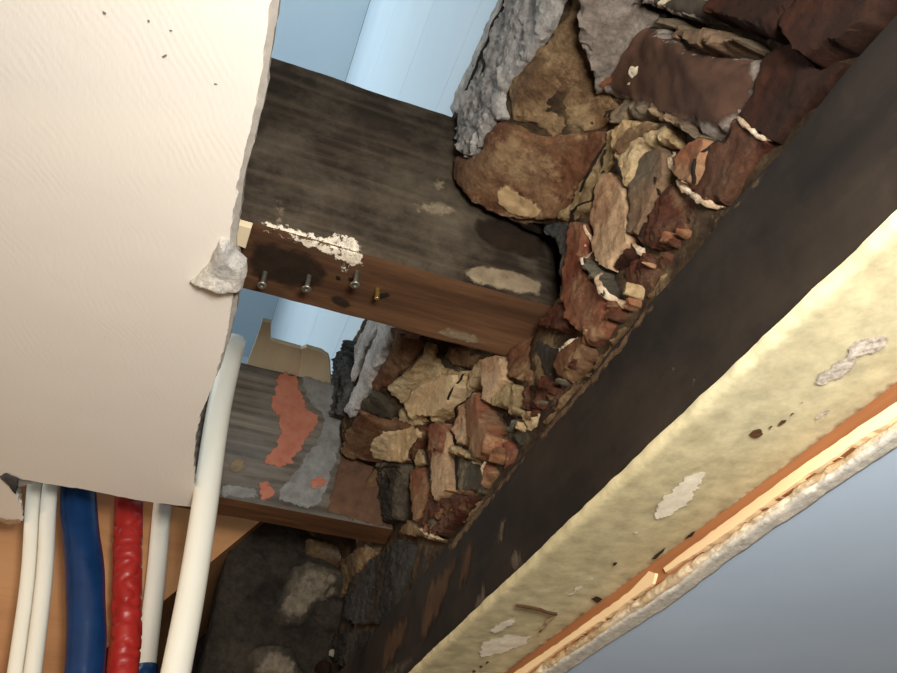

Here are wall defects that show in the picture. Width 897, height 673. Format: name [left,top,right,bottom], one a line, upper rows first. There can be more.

crack [463,0,504,94]
spalling [190,238,248,294]
leakage [251,219,363,287]
peeling [815,335,888,385]
spalling [532,421,897,673]
peeling [479,618,531,658]